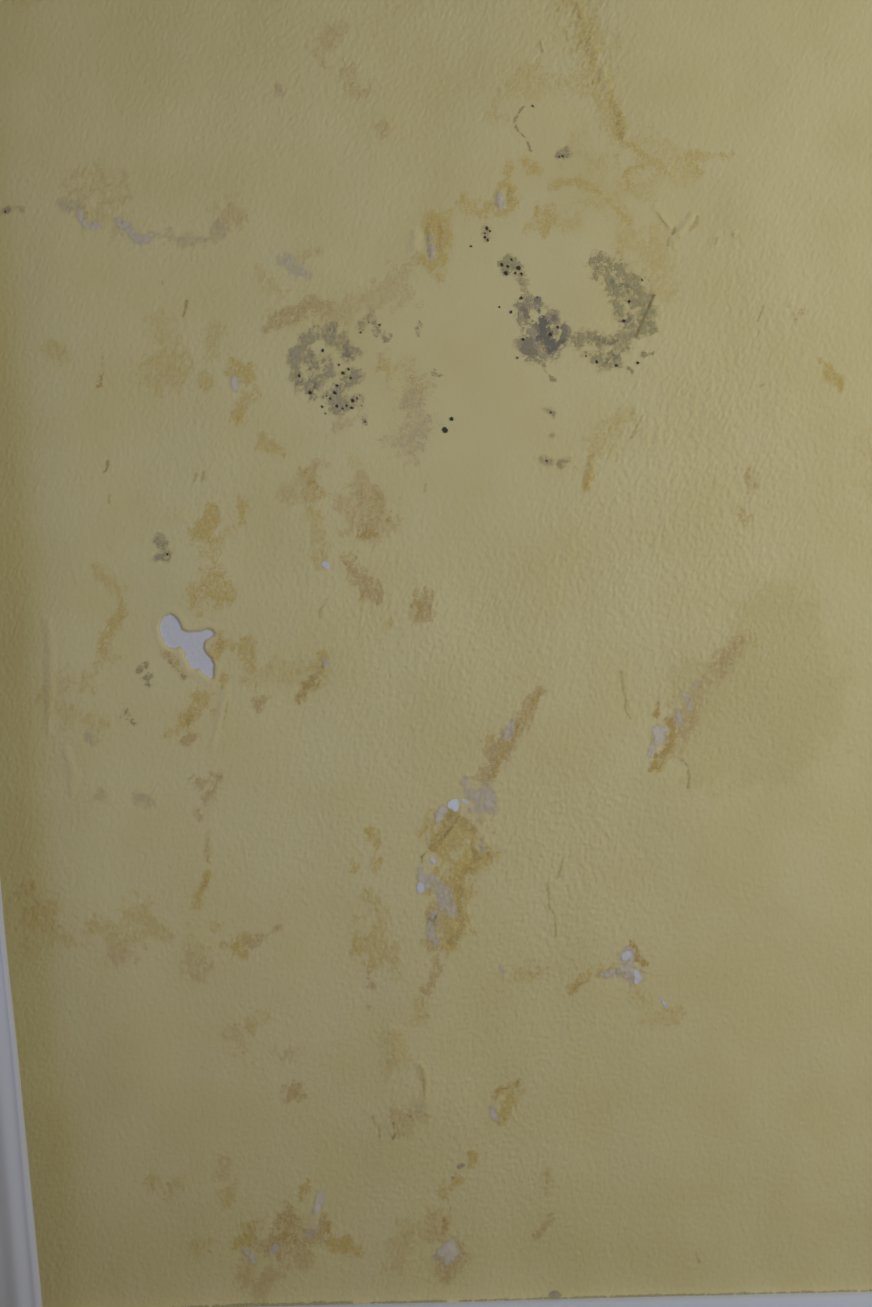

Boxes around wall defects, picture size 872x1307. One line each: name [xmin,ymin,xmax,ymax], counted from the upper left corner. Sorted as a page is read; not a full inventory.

damp [245,0,737,468]
damp [254,431,406,607]
peeling [159,614,214,678]
peeling [435,799,469,823]
peeling [416,857,457,946]
peeling [600,945,642,985]